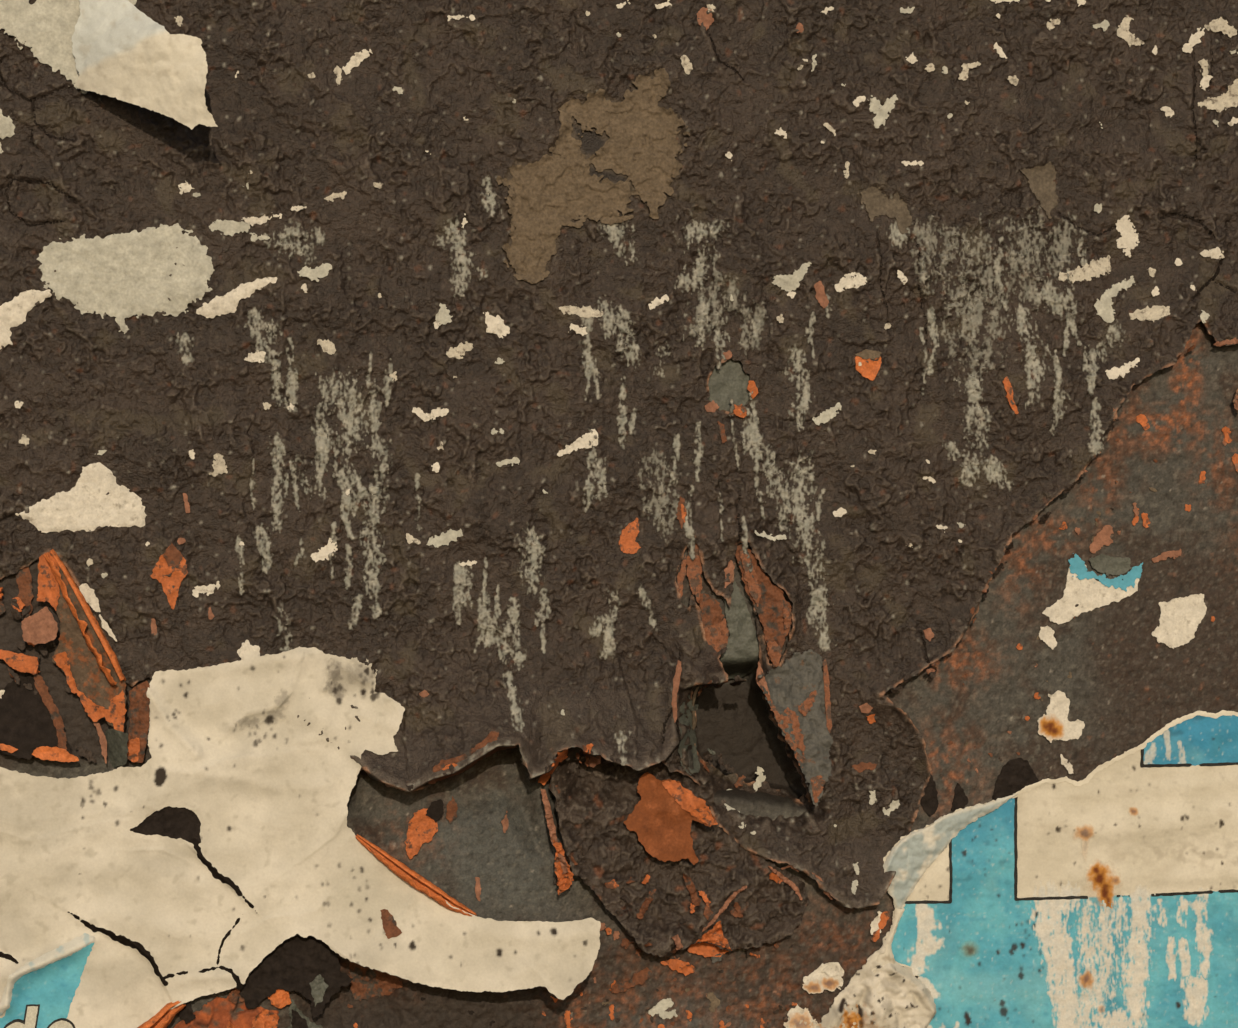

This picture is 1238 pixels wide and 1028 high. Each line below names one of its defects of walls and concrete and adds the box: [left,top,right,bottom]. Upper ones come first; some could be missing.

damp [577,210,775,450]
damp [885,201,1126,492]
peeling [0,549,150,768]
peeling [355,796,481,917]
damp [451,521,553,733]
peeling [538,743,622,895]
peeling [618,518,641,554]
damp [636,421,705,561]
peeling [600,543,833,1021]
damp [729,391,839,652]
corrosion [1038,713,1065,743]
corrosion [784,976,894,1028]